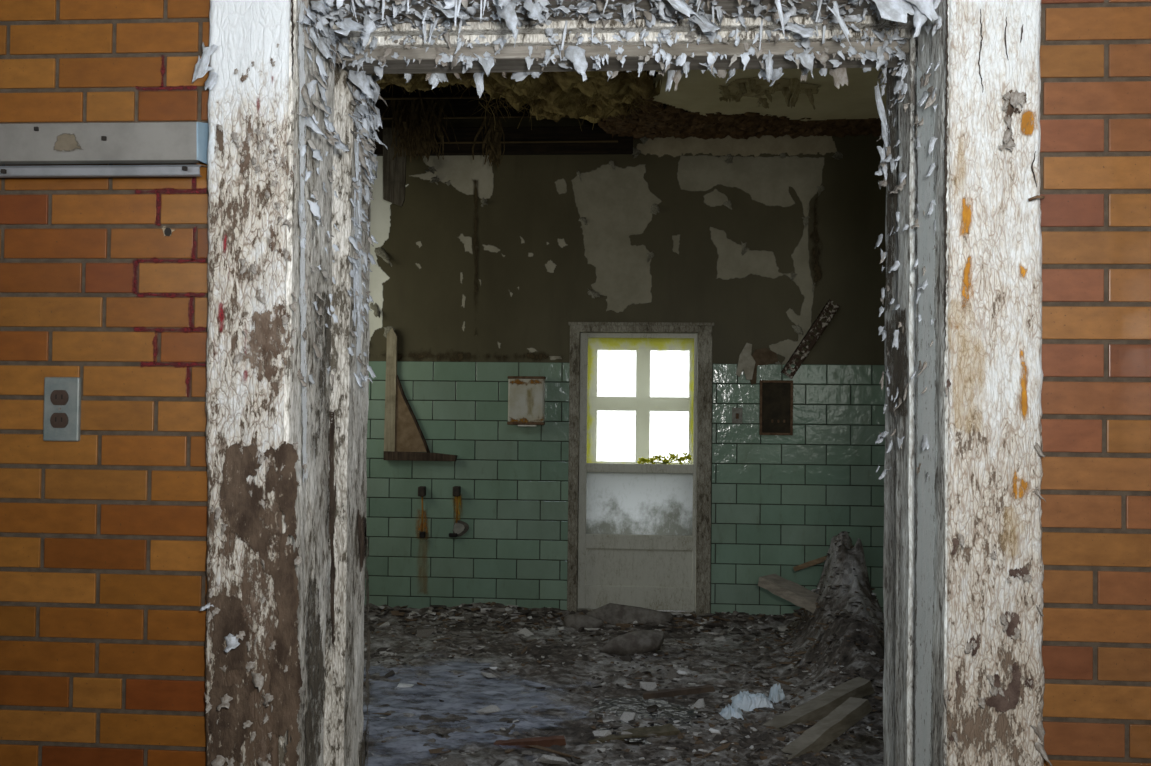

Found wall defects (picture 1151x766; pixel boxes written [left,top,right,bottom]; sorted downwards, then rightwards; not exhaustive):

peeling [192,42,218,90]
rust [1021,110,1034,135]
rust [961,198,973,235]
rust [962,256,973,307]
rust [508,376,546,397]
peeling [200,0,960,766]
rust [1020,349,1028,418]
rust [507,417,545,425]
rust [1013,471,1028,499]
peeling [952,534,964,555]